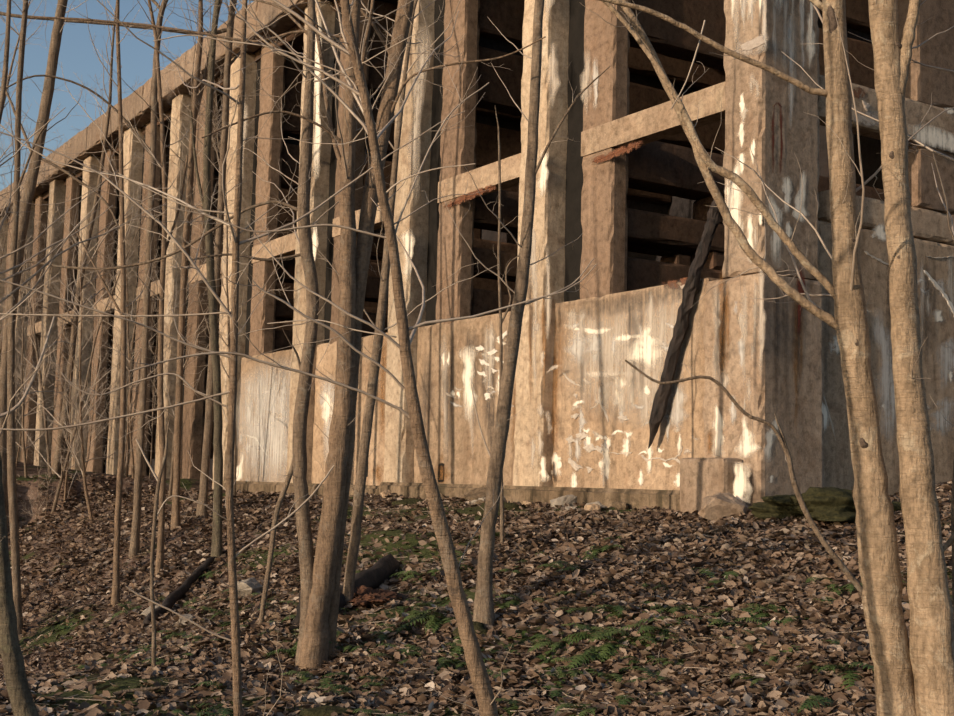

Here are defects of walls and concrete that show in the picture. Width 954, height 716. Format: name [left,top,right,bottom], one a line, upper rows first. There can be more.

water stain [731,0,815,112]
rust [772,103,783,171]
peeling [475,331,507,377]
water stain [714,270,765,387]
water stain [666,385,778,502]